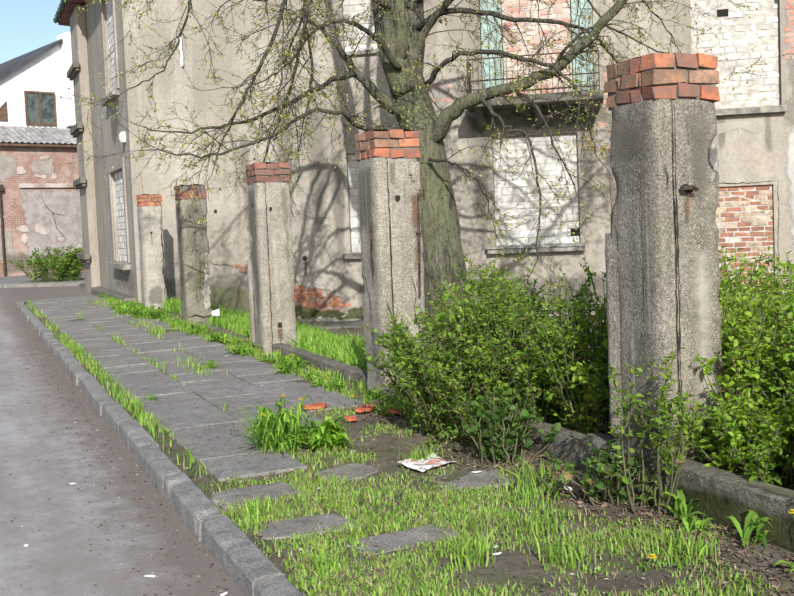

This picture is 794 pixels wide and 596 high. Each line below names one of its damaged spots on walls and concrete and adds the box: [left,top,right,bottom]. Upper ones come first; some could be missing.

flaking render [782,0,794,60]
flaking render [0,155,57,182]
flaking render [0,189,83,263]
spalling [294,276,351,322]
crack [638,178,646,368]
crack [663,108,683,412]